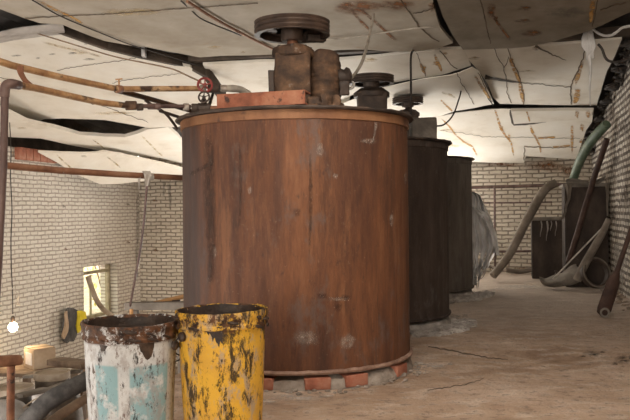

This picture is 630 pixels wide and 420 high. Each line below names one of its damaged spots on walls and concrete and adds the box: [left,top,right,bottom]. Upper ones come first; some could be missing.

rust [339,2,409,38]
crack [401,0,474,104]
crack [440,0,585,159]
crack [428,346,508,360]